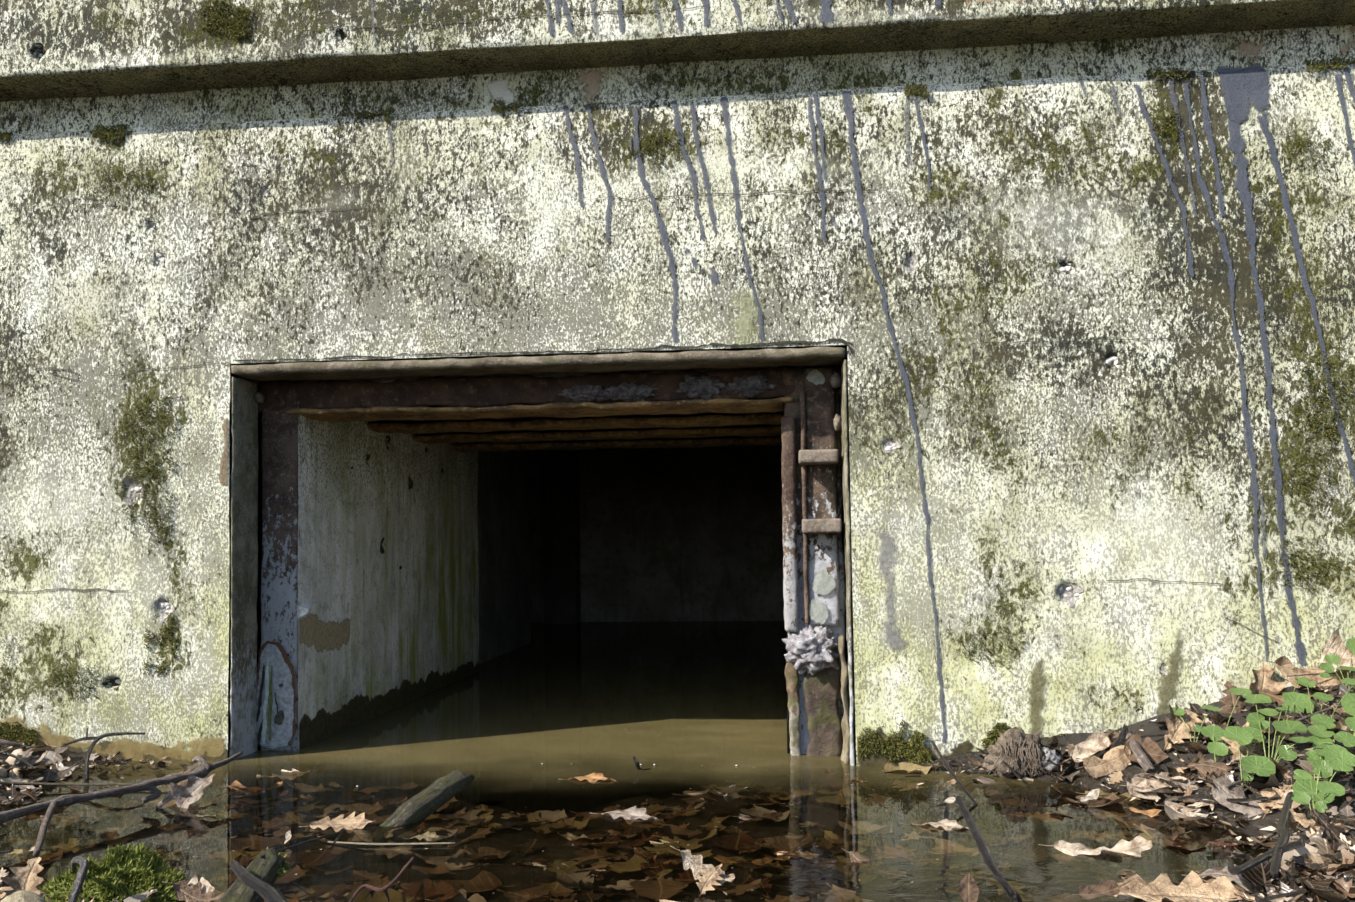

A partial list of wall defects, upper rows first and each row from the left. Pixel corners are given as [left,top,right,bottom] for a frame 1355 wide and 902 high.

water stain [544,0,574,36]
water stain [701,0,710,26]
water stain [563,105,613,242]
water stain [629,107,678,342]
water stain [671,100,716,239]
water stain [720,96,764,340]
rust [556,382,659,403]
rust [676,374,777,400]
water stain [841,91,989,767]
water stain [1135,64,1355,665]
crack [0,586,129,594]
rust [782,625,841,676]